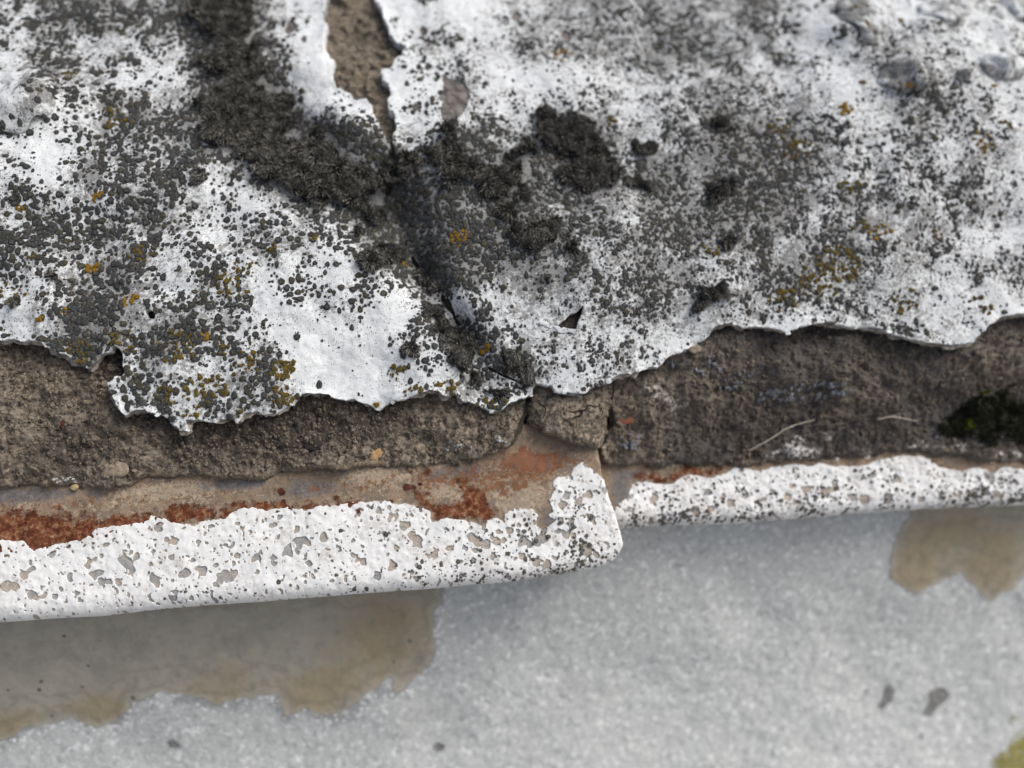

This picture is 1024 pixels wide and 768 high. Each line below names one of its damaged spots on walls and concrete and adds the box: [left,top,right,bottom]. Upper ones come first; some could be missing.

spalling [326,0,400,156]
crack [411,256,420,269]
crack [438,289,461,325]
spalling [0,342,533,489]
crack [486,366,614,430]
spalling [598,317,1024,469]
rust [0,447,593,556]
damp [891,505,1024,602]
damp [0,588,442,741]